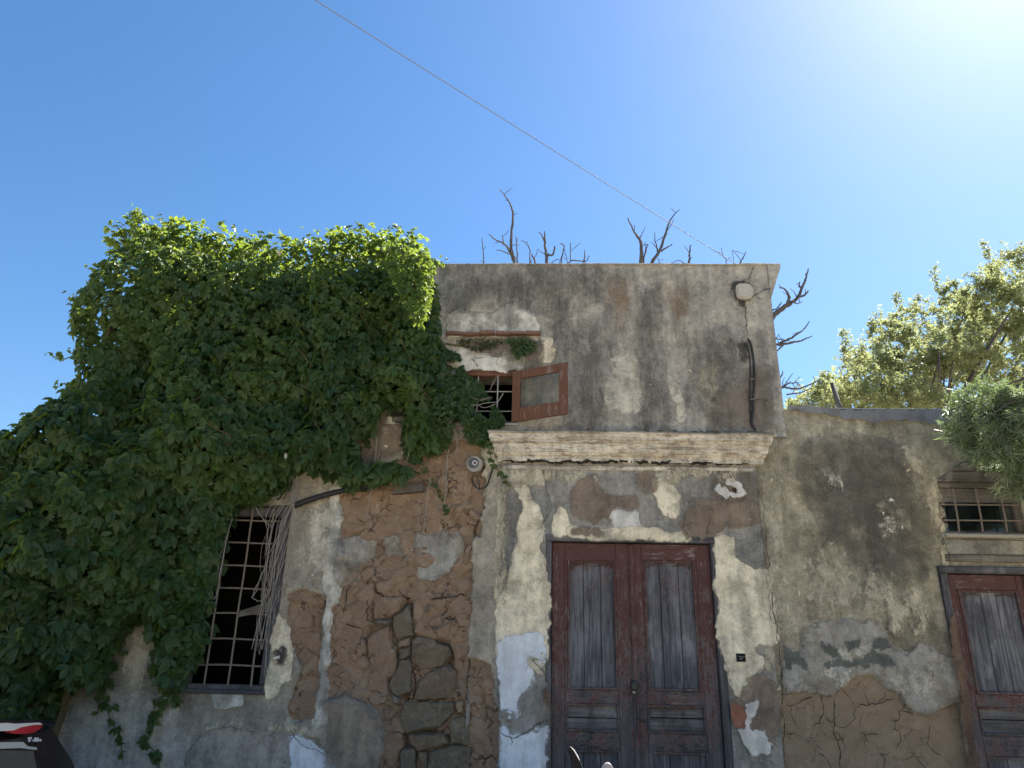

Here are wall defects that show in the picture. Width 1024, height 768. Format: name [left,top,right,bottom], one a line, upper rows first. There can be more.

peeling [445,302,556,373]
crack [737,267,769,337]
water stain [801,438,934,582]
flaking render [263,411,968,768]
crack [501,459,940,768]